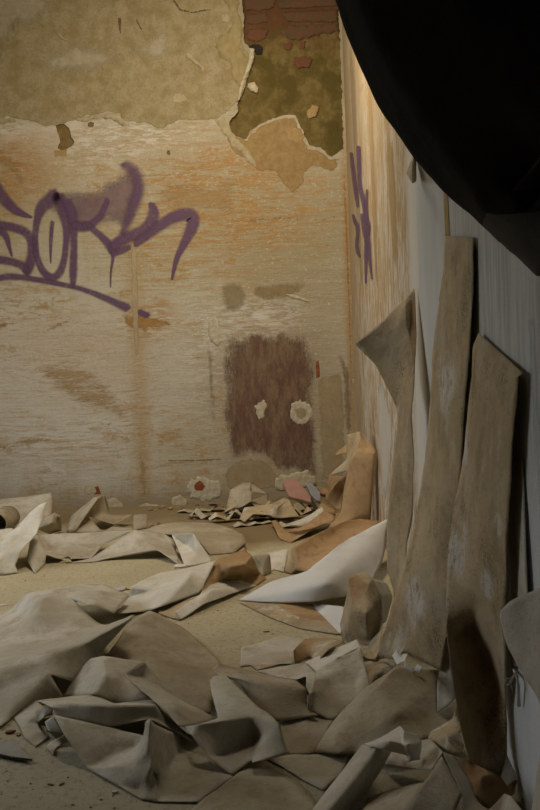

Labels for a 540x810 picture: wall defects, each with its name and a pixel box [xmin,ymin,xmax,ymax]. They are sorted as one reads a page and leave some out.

peeling [0,0,344,192]